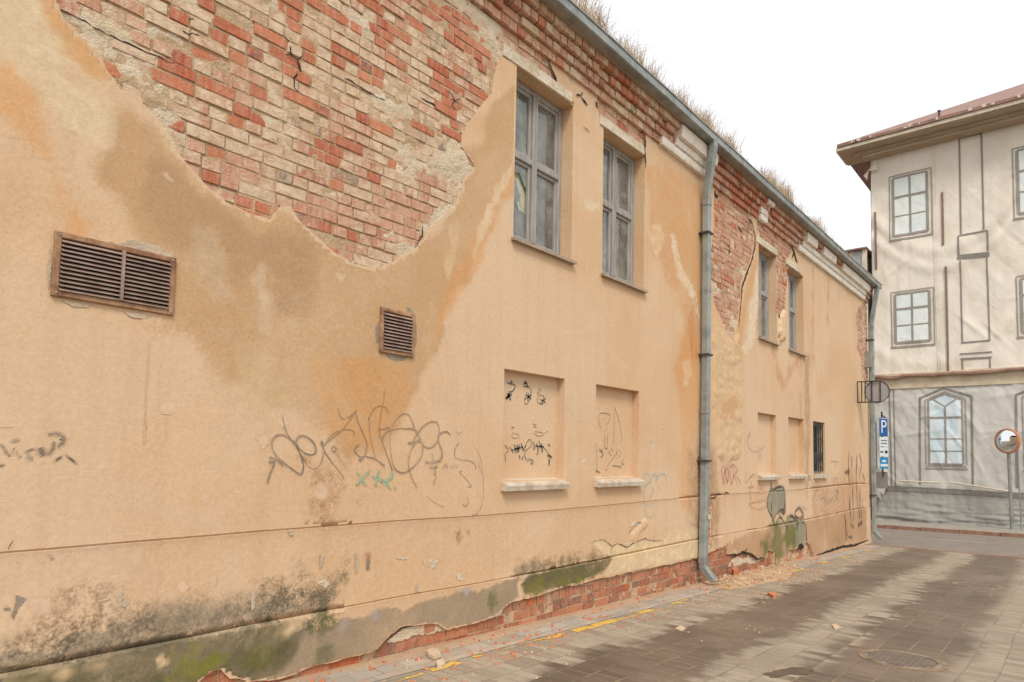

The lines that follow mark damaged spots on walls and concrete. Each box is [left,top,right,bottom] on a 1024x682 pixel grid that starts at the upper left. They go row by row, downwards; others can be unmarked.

crack [60,9,172,63]
crack [284,35,302,95]
spalling [56,0,554,268]
water stain [0,0,515,529]
crack [727,216,756,323]
spalling [711,188,792,338]
water stain [769,261,870,551]
water stain [0,539,353,671]
spalling [199,455,867,682]
water stain [510,543,607,583]